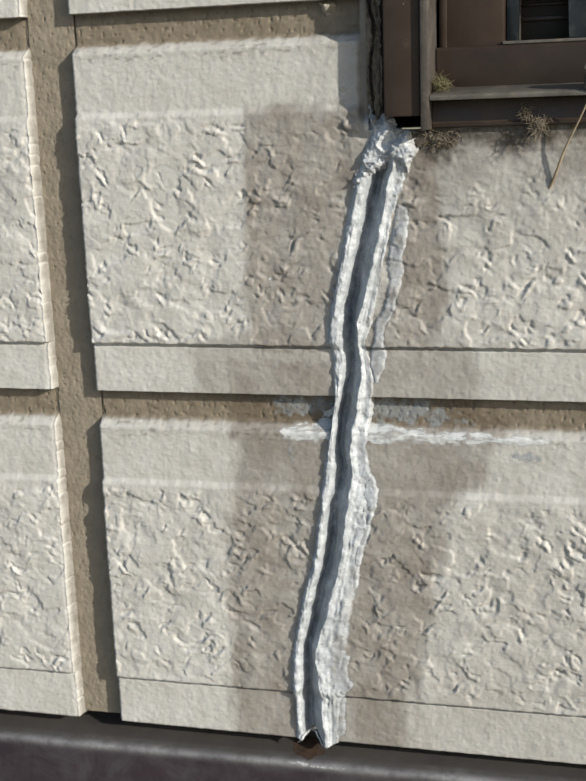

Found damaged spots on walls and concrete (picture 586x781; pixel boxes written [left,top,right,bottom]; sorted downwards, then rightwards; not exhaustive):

rust [294,737,325,760]
crack [292,0,419,749]